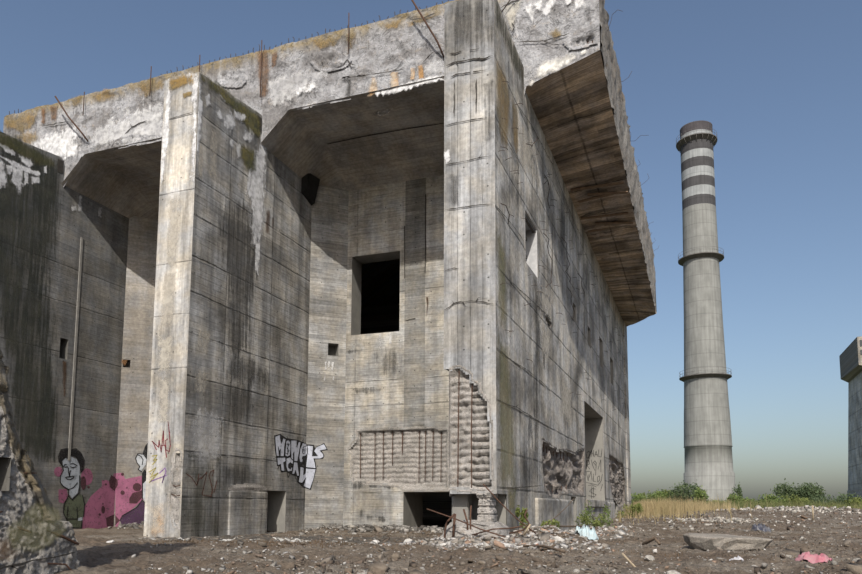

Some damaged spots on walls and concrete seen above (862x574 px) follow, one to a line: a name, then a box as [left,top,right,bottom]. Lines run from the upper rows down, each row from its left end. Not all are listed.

leakage [0,127,78,462]
leakage [189,73,269,420]
corrosion [258,52,277,95]
crack [337,48,580,233]
crack [447,204,523,240]
leakage [454,0,590,83]
spalling [0,349,80,574]
spalling [346,365,536,539]
spalling [542,437,585,499]
spalling [609,453,626,508]